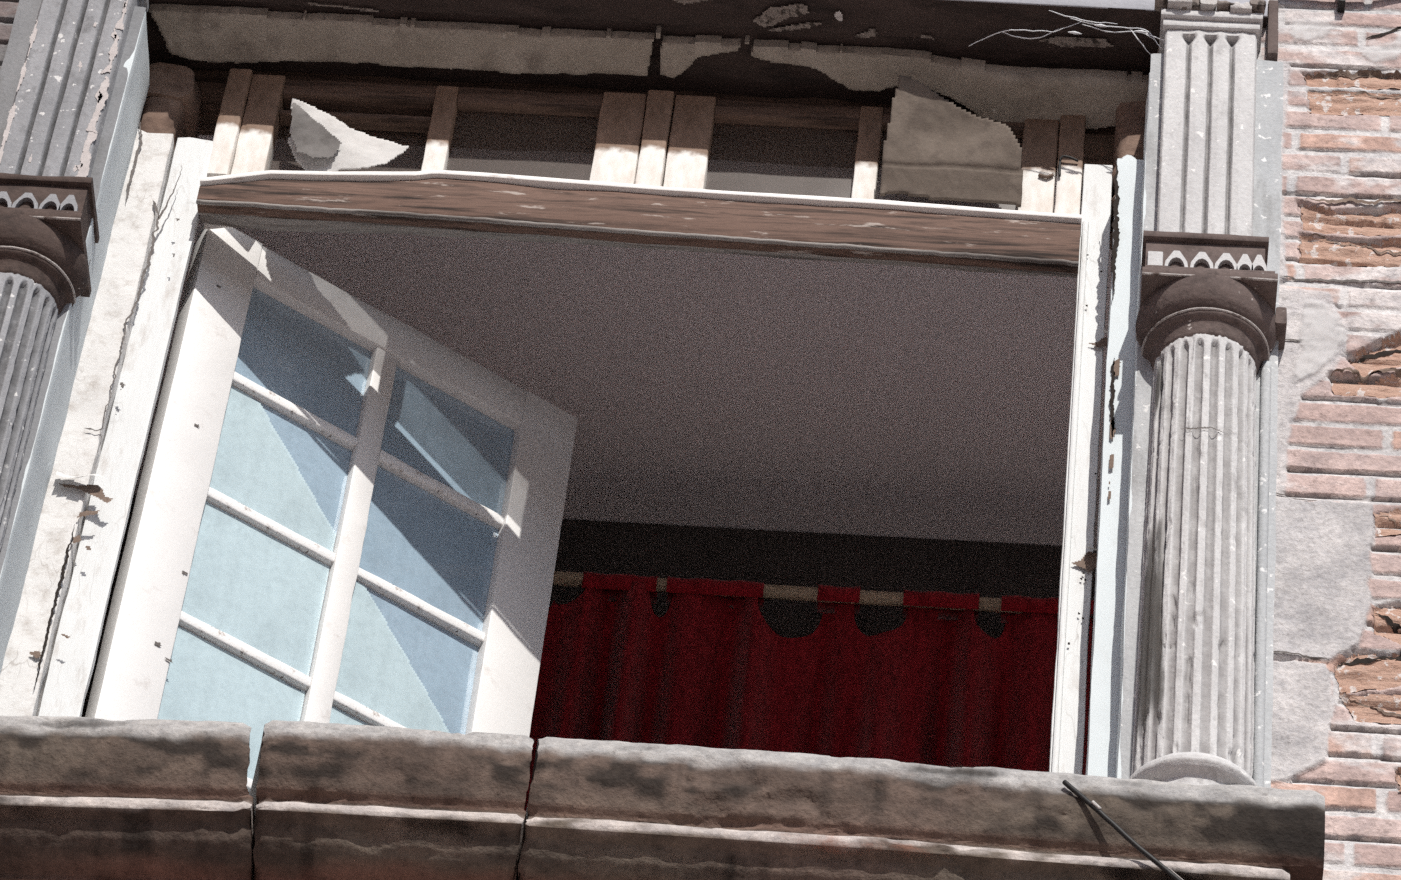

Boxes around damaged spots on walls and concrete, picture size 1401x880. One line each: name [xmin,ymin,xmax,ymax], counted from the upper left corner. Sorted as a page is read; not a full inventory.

peeling [753,4,821,32]
peeling [855,29,877,38]
peeling [1039,36,1114,48]
crack [85,122,182,454]
peeling [1295,300,1401,399]
spalling [1373,508,1401,536]
crack [34,524,75,688]
spalling [1335,605,1401,724]